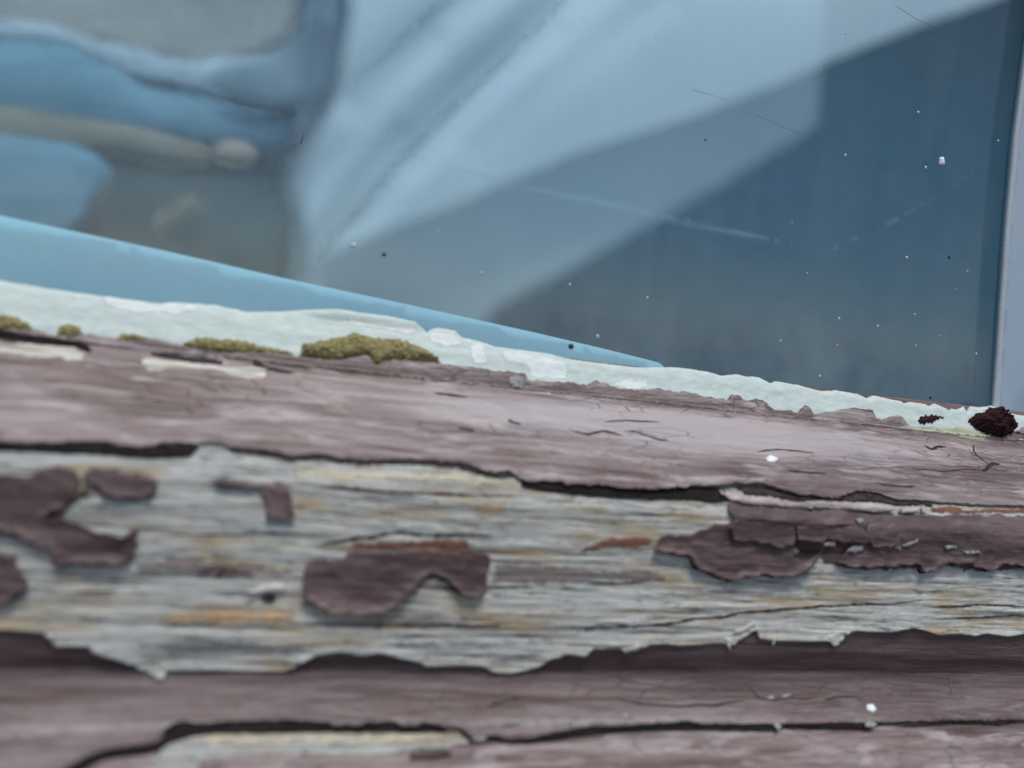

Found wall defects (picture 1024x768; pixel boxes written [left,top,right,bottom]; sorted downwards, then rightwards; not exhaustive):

crack [0,442,199,458]
crack [229,445,999,554]
peeling [0,442,1024,680]
crack [71,686,1024,768]